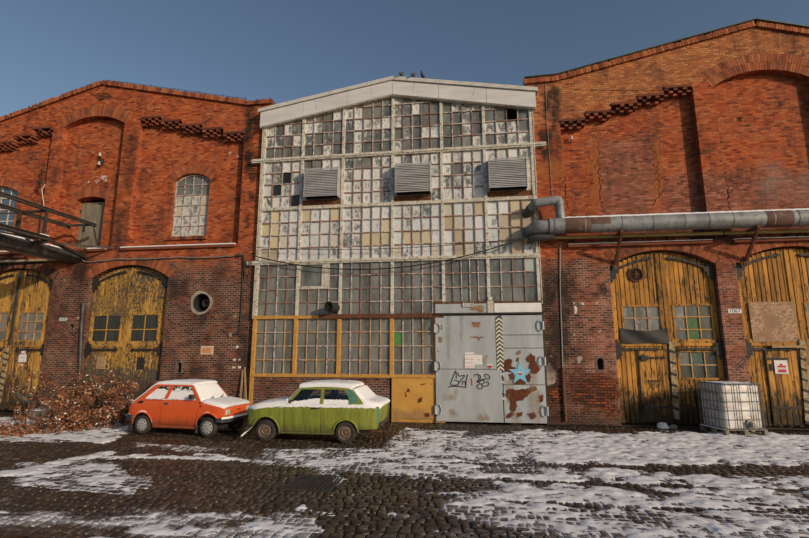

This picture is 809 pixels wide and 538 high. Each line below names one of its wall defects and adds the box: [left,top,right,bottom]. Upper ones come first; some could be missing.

crack [594,129,612,209]
corrosion [504,350,543,420]